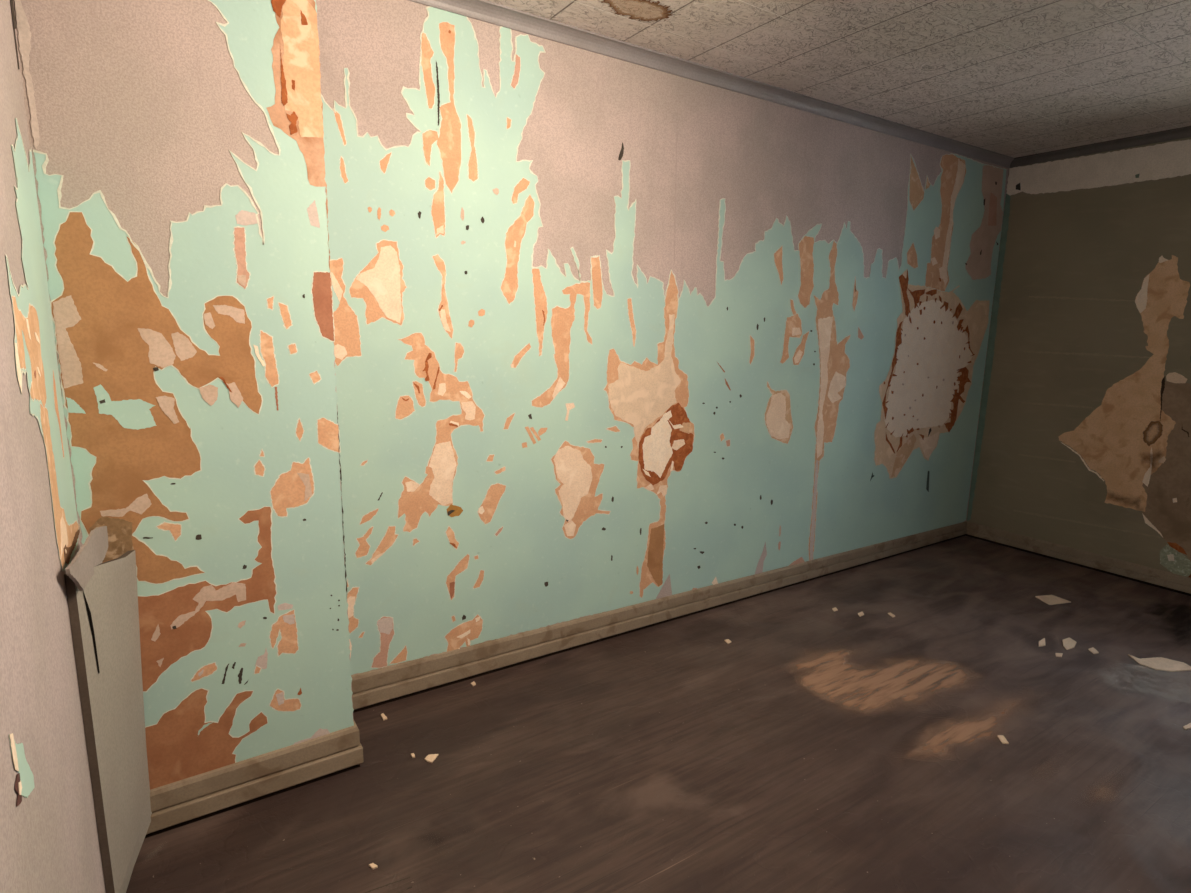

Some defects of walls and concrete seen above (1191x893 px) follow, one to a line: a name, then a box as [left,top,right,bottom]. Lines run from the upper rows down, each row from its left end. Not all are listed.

water stain [601,0,672,22]
flaking render [1006,139,1191,195]
peeling [5,0,1007,790]
peeling [1058,255,1191,577]